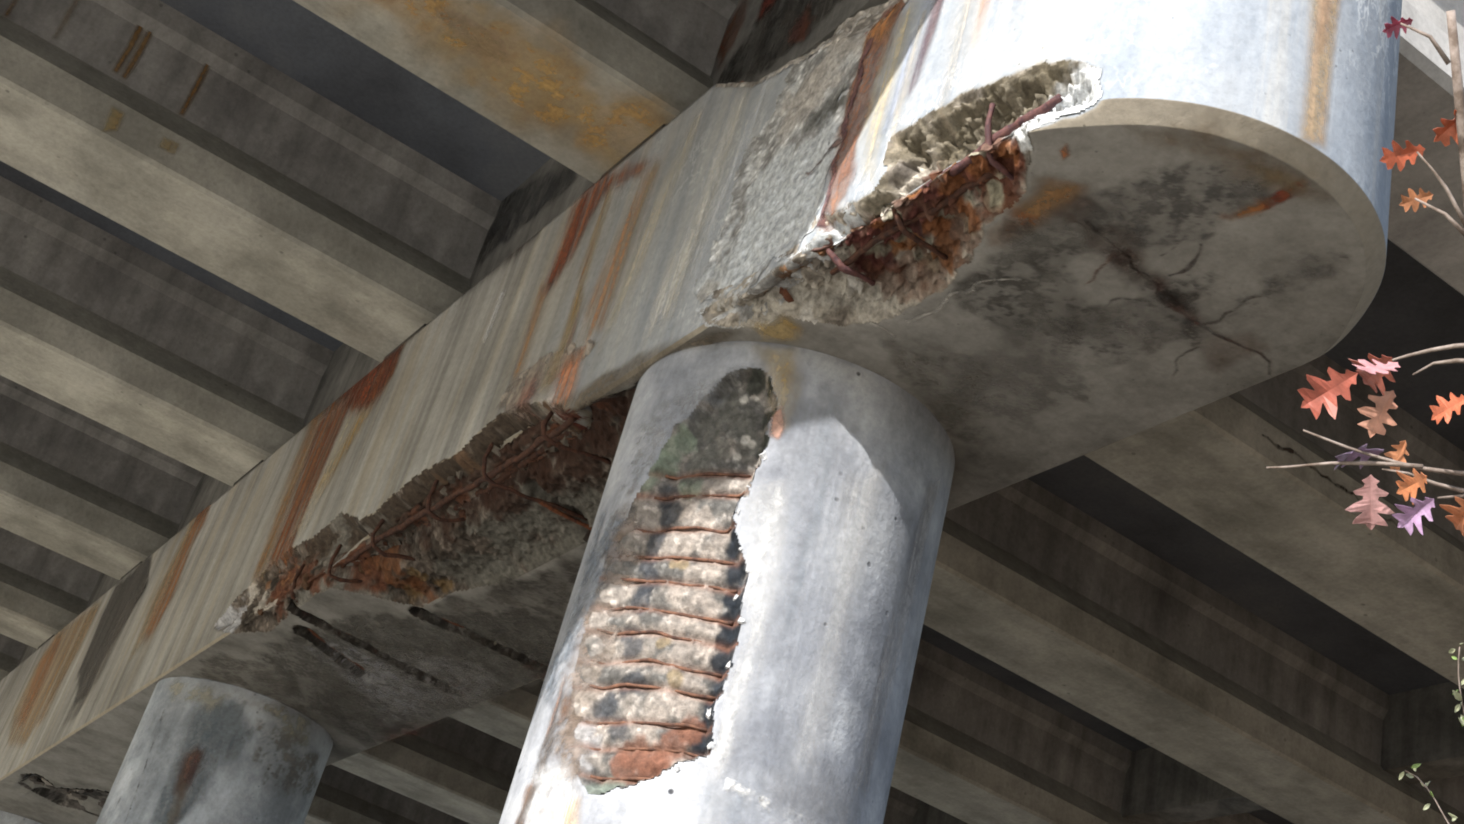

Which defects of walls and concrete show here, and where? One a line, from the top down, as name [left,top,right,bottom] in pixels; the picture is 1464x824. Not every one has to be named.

rust [826,0,942,222]
spalling [698,59,1103,329]
leakage [887,132,1309,441]
crack [1084,220,1270,373]
rust [1304,0,1338,141]
rust [9,607,97,742]
rust [133,507,208,654]
rust [175,749,202,815]
rust [254,346,403,576]
spalling [215,339,639,634]
spalling [567,367,777,795]